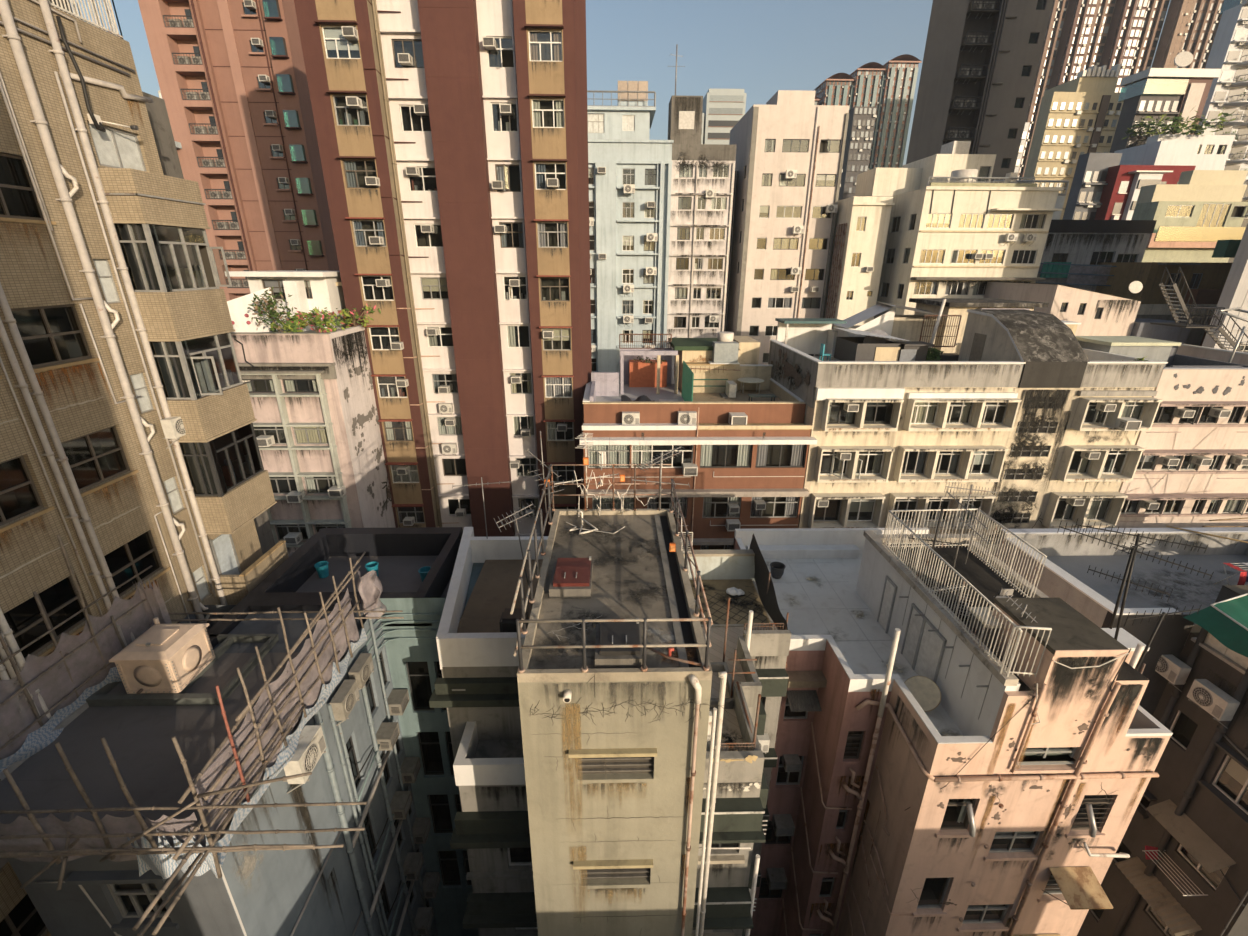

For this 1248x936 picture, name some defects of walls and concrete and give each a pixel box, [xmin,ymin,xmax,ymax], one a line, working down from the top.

peeling [1173,373,1245,396]
spalling [344,360,392,517]
water stain [909,388,1085,542]
water stain [611,682,664,695]
water stain [1028,657,1117,704]
water stain [1103,684,1143,723]
water stain [1131,738,1162,760]
water stain [481,786,526,800]